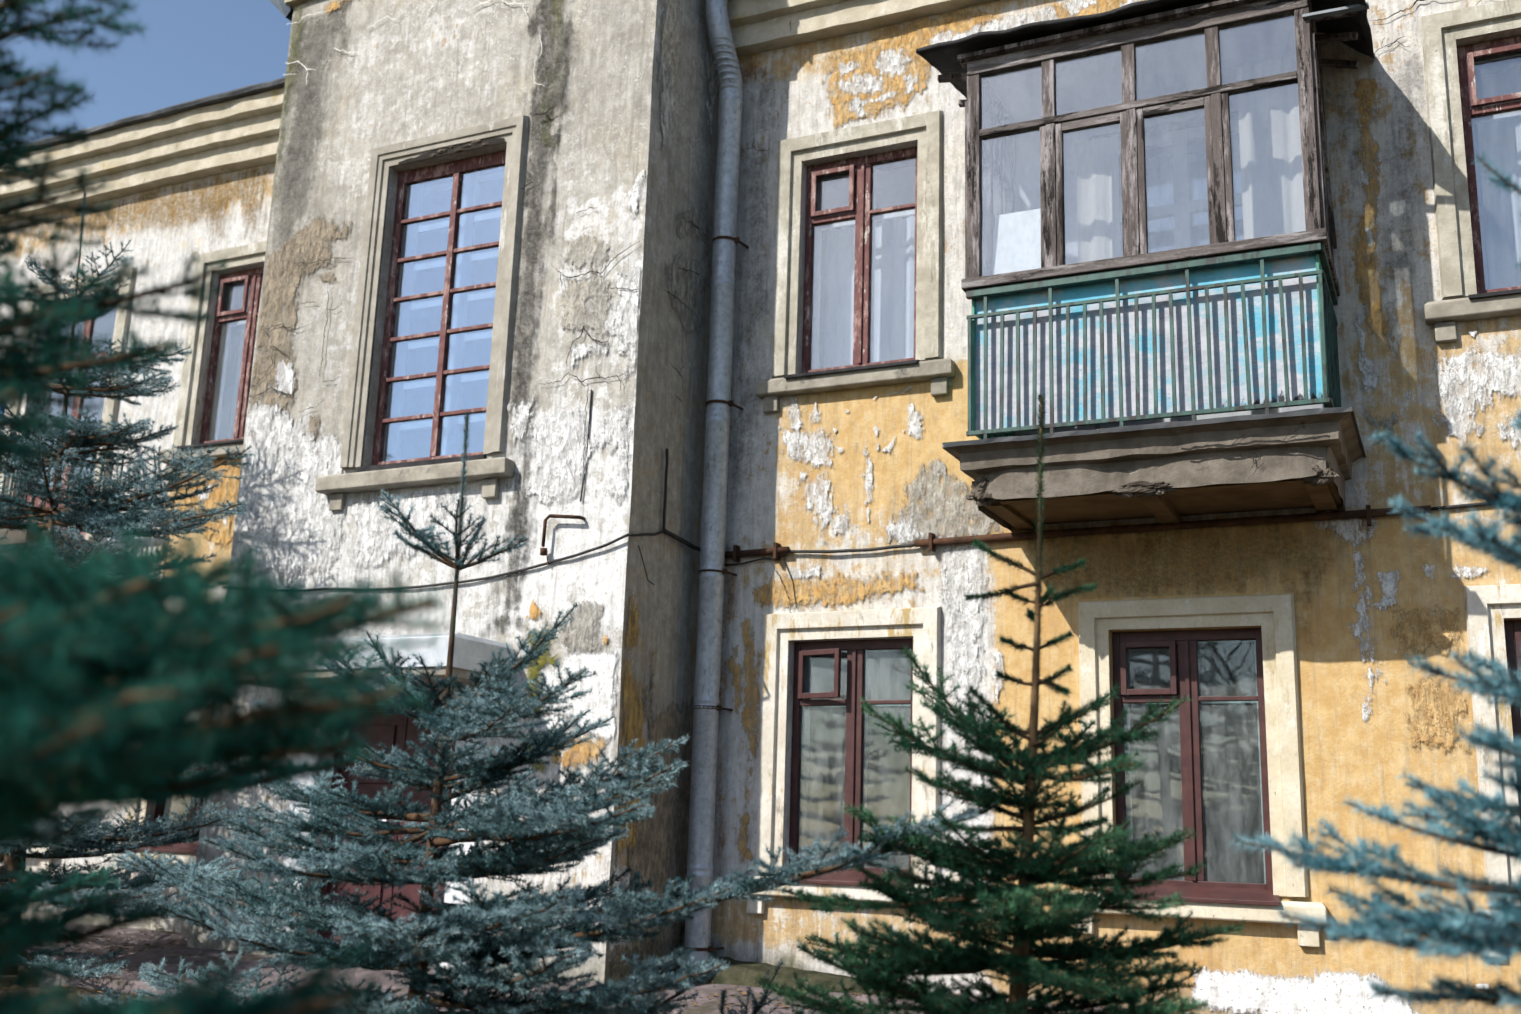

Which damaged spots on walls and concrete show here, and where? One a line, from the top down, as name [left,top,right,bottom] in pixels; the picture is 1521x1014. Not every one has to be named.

peeling [821,0,1144,128]
crack [1369,0,1425,50]
leakage [494,0,571,627]
flaking render [560,233,640,381]
peeling [170,216,467,581]
peeling [507,396,631,508]
peeling [1432,330,1521,454]
peeling [727,386,1004,787]
peeling [1314,508,1462,720]
peeling [1423,561,1487,581]
peeling [1398,675,1471,754]
peeling [737,813,752,863]